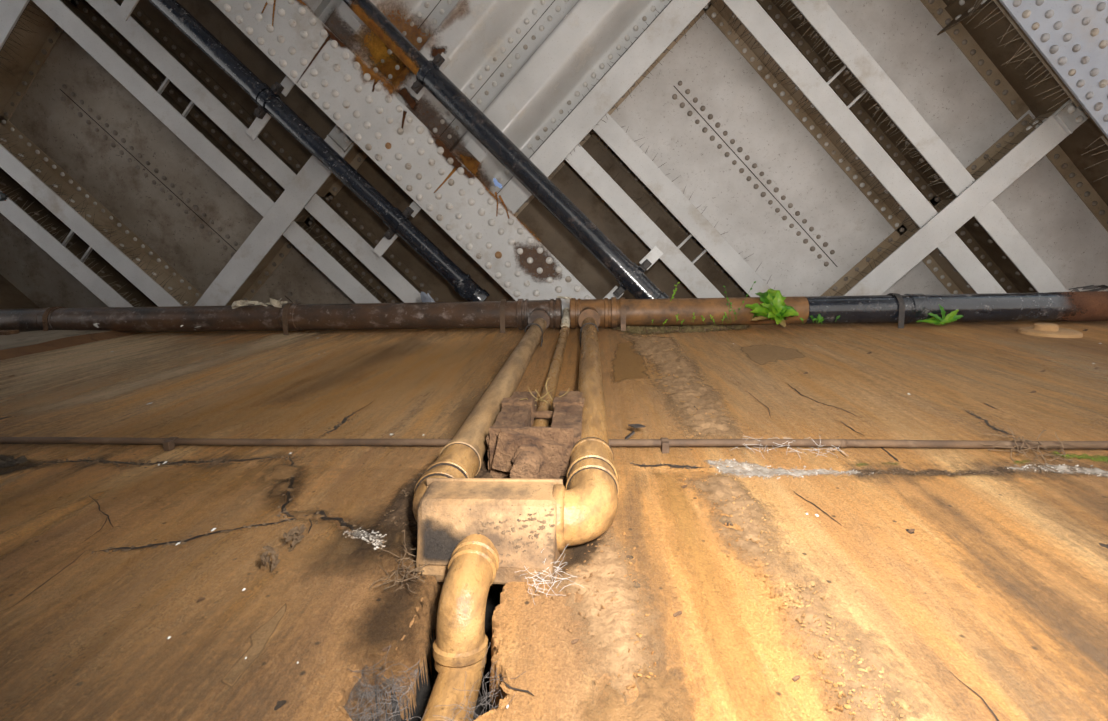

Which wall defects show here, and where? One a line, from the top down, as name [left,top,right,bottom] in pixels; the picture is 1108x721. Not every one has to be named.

corrosion [297,2,540,242]
water stain [0,329,514,475]
crack [321,401,374,436]
water stain [708,459,908,479]
water stain [978,462,1108,477]
crack [0,454,364,613]
spalling [394,597,426,655]
spalling [491,635,514,698]